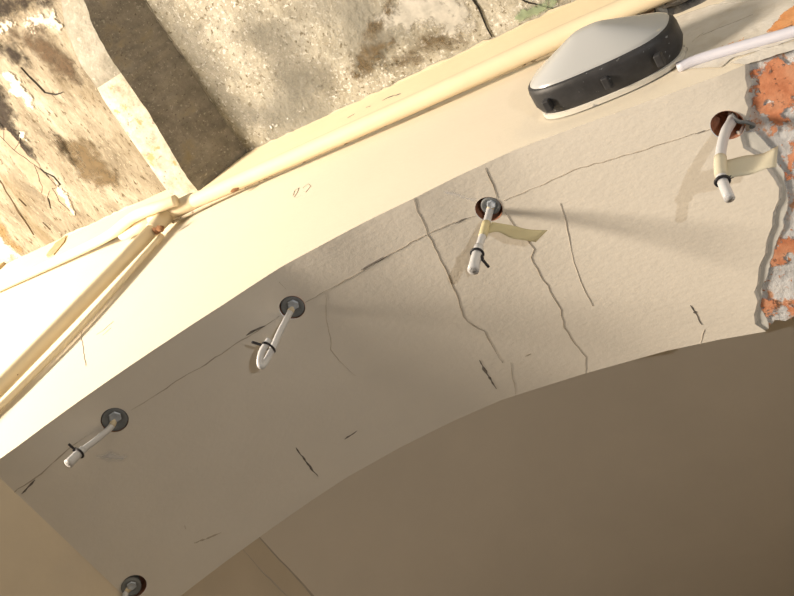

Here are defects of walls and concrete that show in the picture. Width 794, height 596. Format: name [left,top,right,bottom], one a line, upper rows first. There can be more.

water stain [0,0,81,86]
crack [472,0,492,37]
water stain [0,71,34,159]
water stain [54,181,75,216]
water stain [50,134,117,187]
crack [485,129,710,225]
spalling [643,0,794,330]
water stain [0,237,21,264]
crack [310,201,516,396]
crack [528,241,586,372]
crack [560,204,593,306]
crack [135,316,279,408]